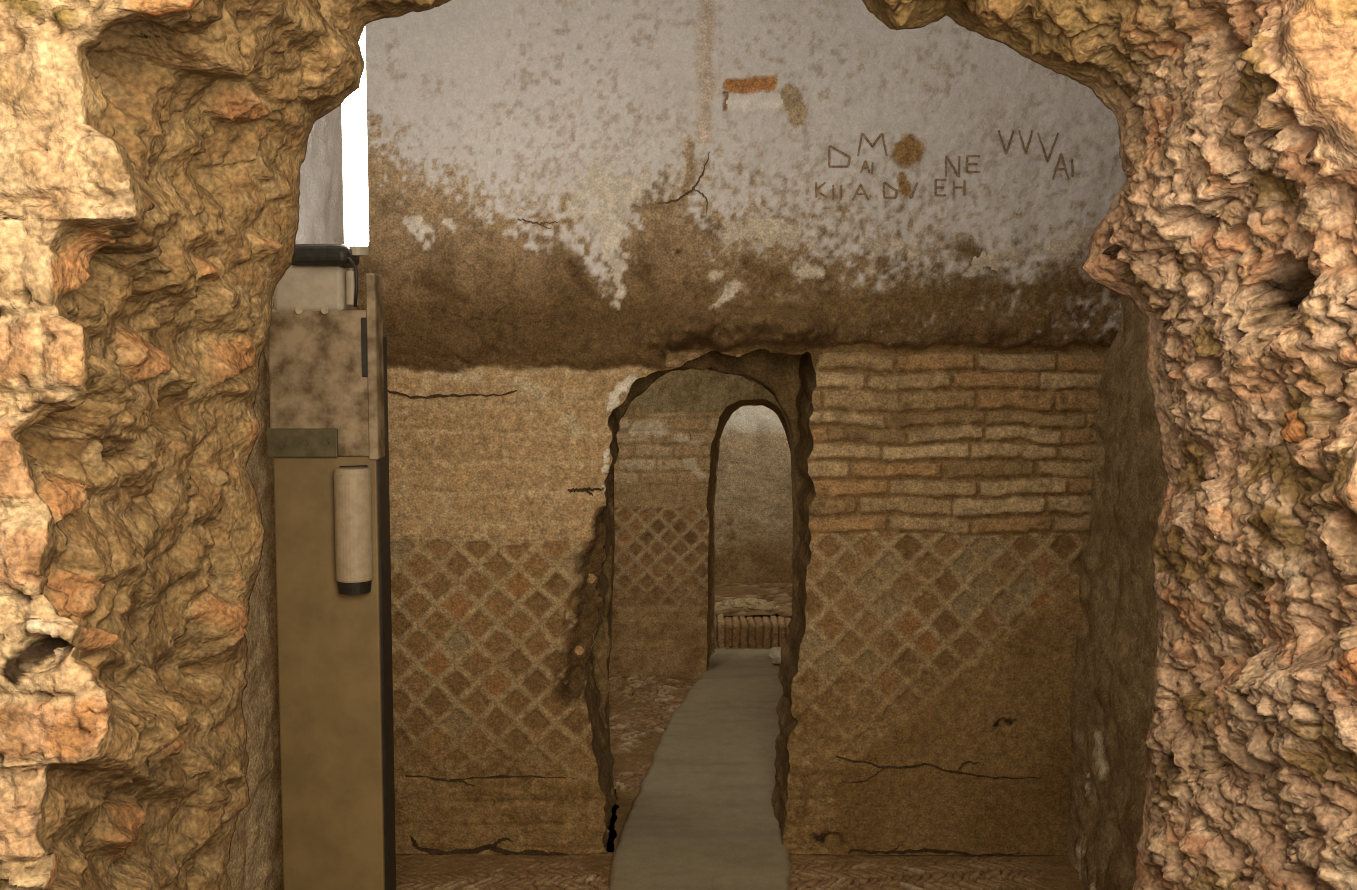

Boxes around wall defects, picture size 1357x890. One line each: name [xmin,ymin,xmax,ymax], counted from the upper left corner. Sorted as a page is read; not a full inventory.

spalling [721,74,811,130]
peeling [400,214,458,252]
peeling [562,144,655,311]
peeling [706,211,828,311]
peeling [959,214,1097,277]
crack [836,756,1041,784]
crack [410,836,567,856]